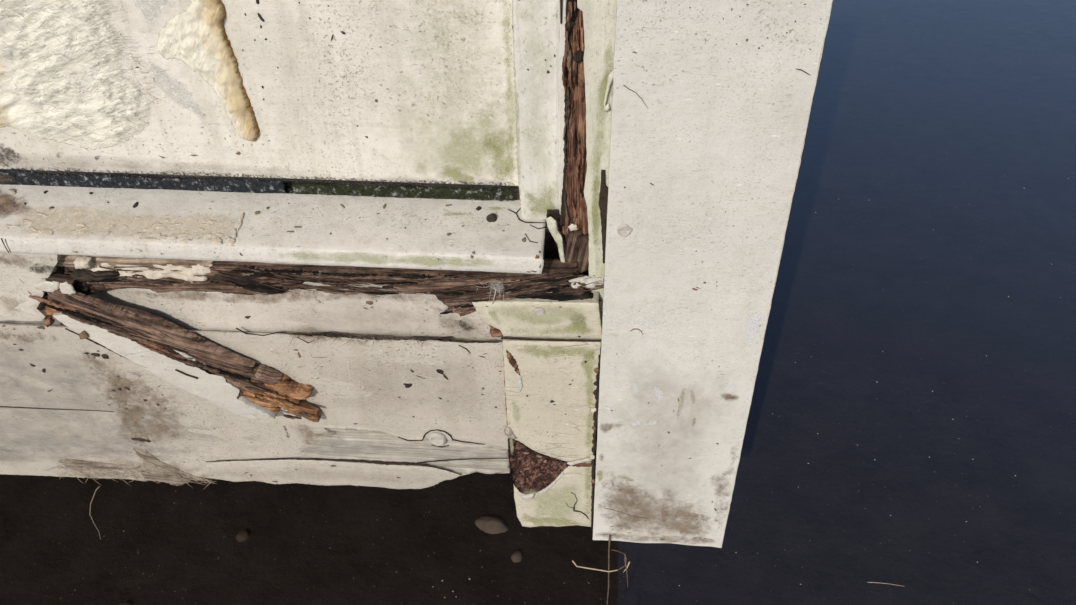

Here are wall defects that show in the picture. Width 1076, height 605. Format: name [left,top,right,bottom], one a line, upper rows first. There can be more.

peeling [28,281,76,295]
peeling [569,275,604,289]
peeling [490,326,503,337]
peeling [251,364,283,385]
peeling [488,350,528,397]